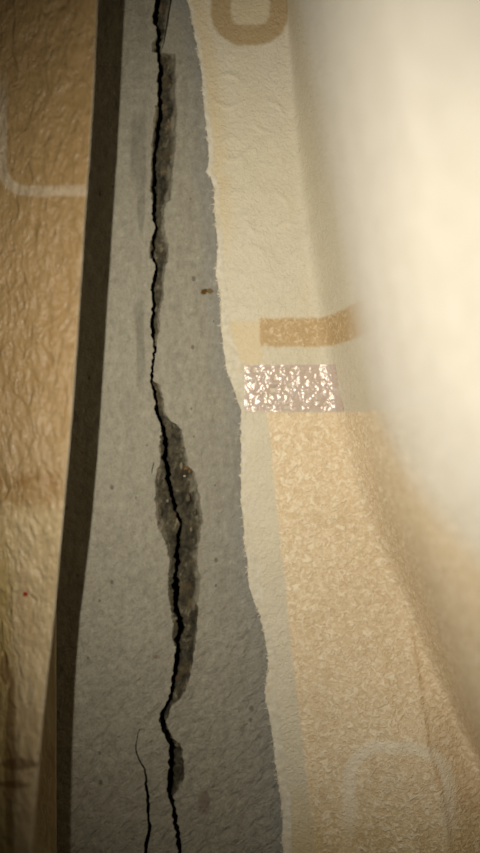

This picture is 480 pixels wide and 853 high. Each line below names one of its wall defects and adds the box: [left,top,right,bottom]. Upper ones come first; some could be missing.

flaking render [149,0,178,346]
crack [135,0,185,853]
flaking render [152,382,203,796]